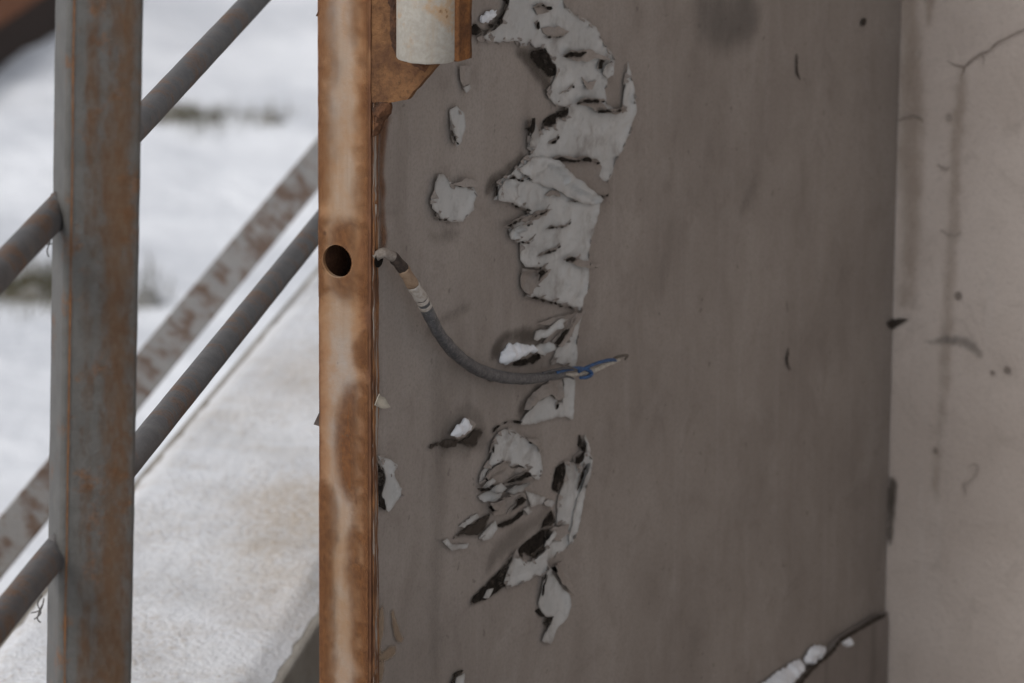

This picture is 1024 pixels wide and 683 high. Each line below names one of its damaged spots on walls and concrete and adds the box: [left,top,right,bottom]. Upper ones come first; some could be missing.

corrosion [388,0,431,72]
corrosion [64,0,75,683]
corrosion [318,220,368,299]
corrosion [354,331,368,369]
peeling [429,0,638,644]
corrosion [319,484,334,683]
corrosion [336,385,368,683]
peeling [377,455,404,512]